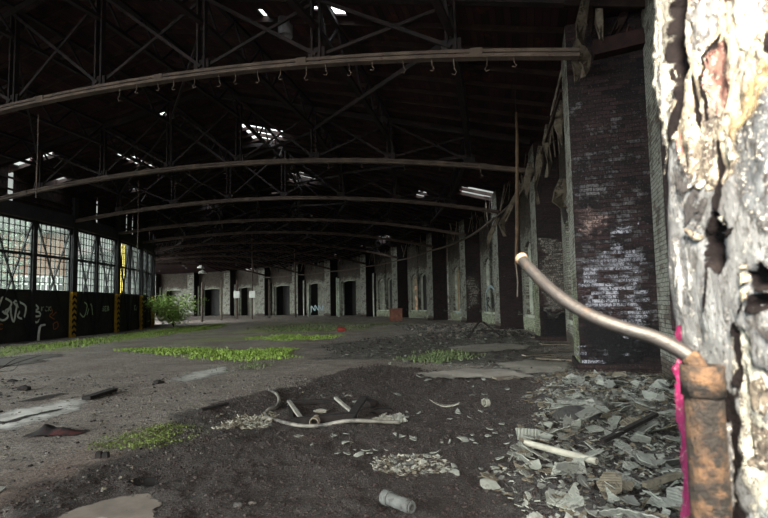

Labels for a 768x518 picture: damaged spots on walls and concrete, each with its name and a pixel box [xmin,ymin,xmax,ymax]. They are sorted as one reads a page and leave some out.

spalling [670,0,768,314]